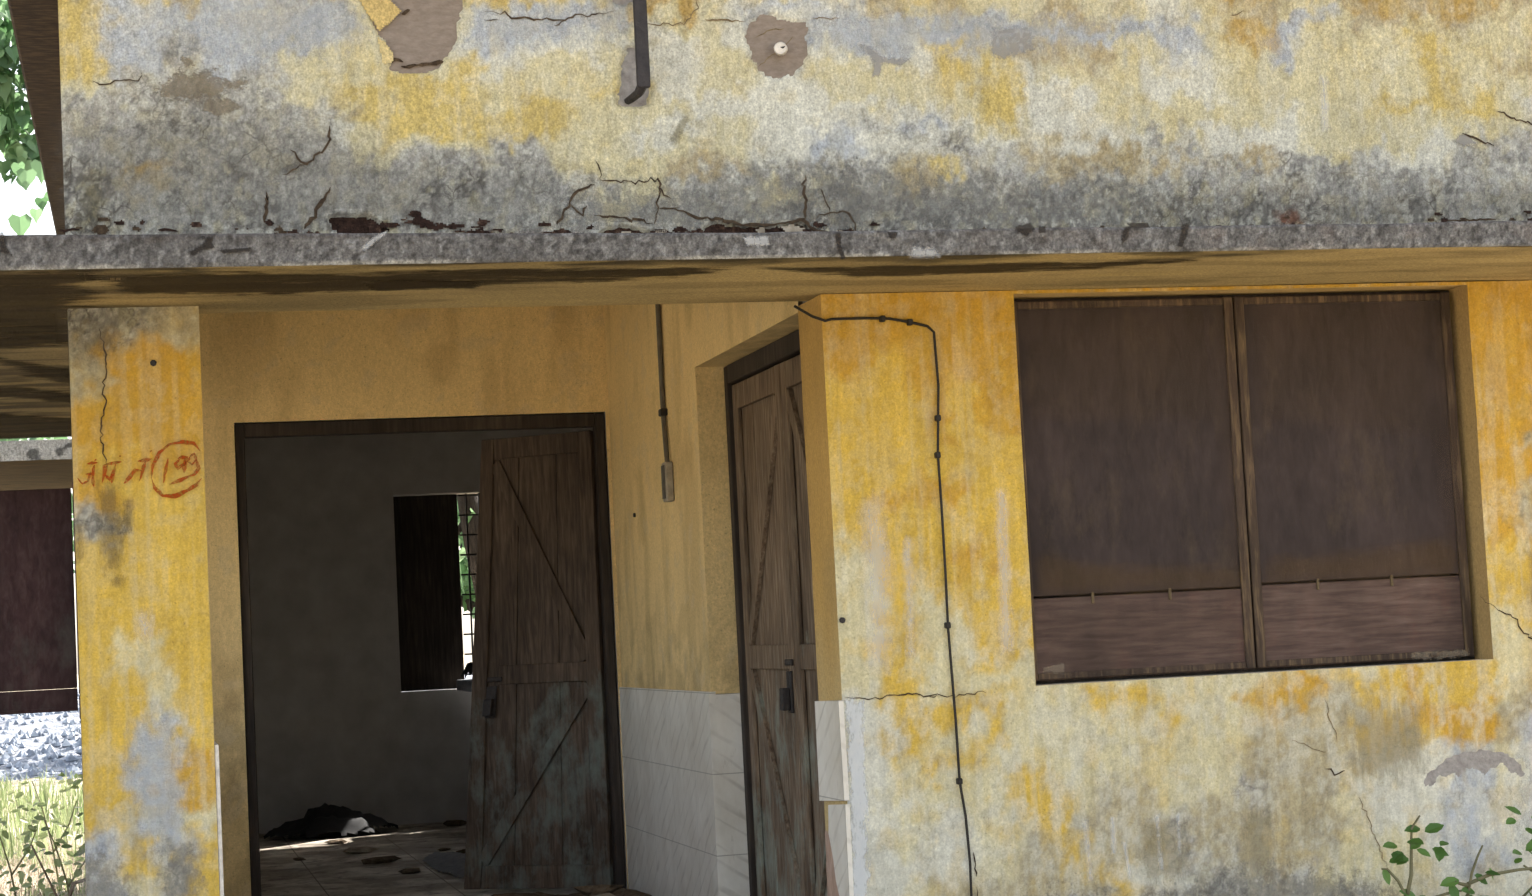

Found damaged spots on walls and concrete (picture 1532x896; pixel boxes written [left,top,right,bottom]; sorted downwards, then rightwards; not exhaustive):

spalling [360,0,463,74]
spalling [745,14,808,79]
crack [263,126,331,229]
crack [556,160,856,231]
spalling [76,217,145,234]
spalling [235,211,513,233]
spalling [538,221,880,233]
crack [1448,216,1496,224]
crack [99,329,108,467]
crack [1480,596,1532,639]
crack [847,691,986,700]